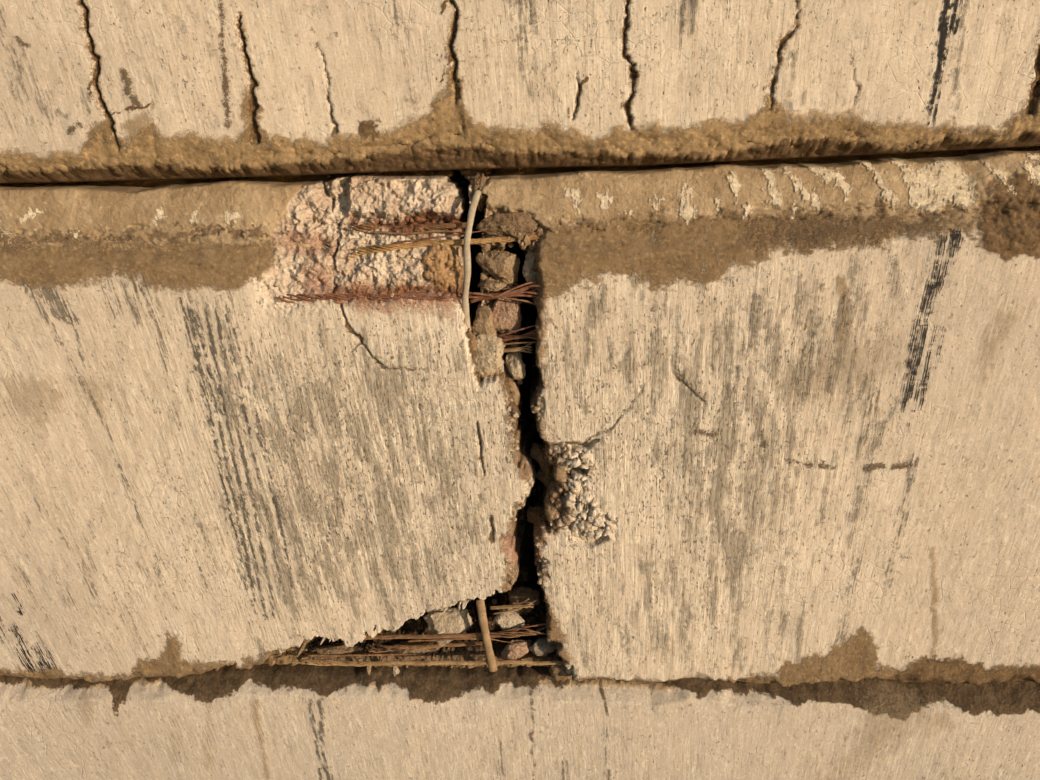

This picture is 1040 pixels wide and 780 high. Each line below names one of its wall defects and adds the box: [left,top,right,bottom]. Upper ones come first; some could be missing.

crack [77,0,151,140]
crack [236,12,261,145]
crack [438,0,460,99]
damp [0,0,1040,183]
crack [620,0,640,131]
crack [1024,32,1040,115]
peeling [149,206,168,226]
rust [277,207,477,318]
damp [0,171,1040,780]
crack [447,170,643,595]
spalling [185,161,905,682]
peeling [59,521,101,611]